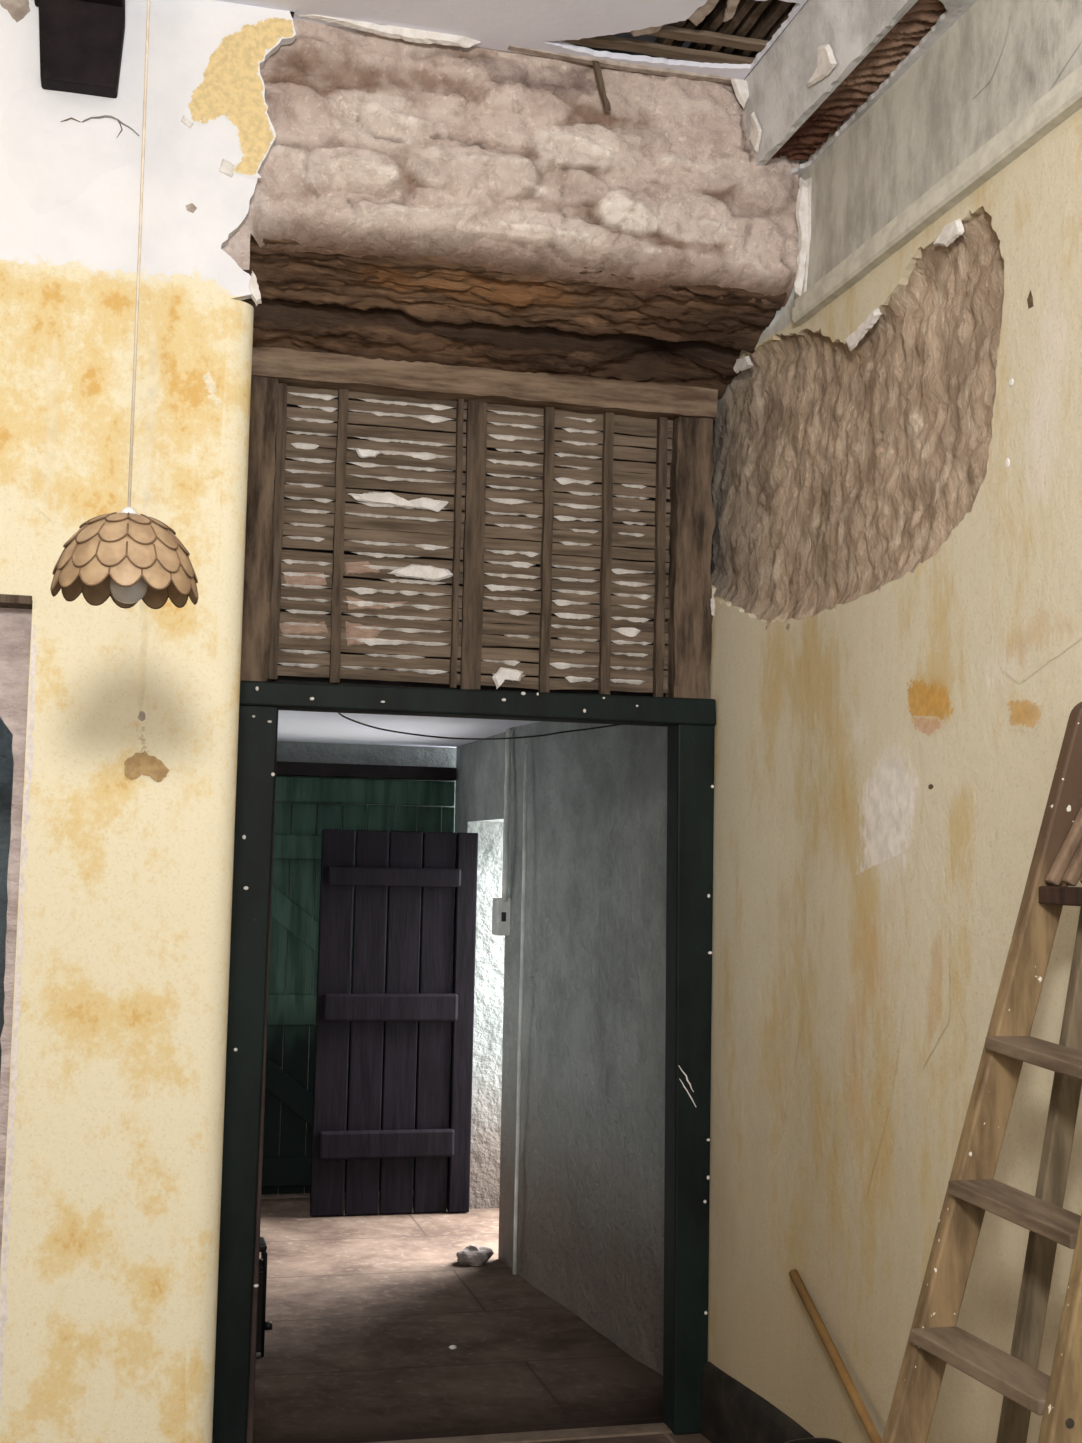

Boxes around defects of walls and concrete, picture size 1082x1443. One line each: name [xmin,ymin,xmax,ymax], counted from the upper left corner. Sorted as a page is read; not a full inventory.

flaking render [181,0,946,307]